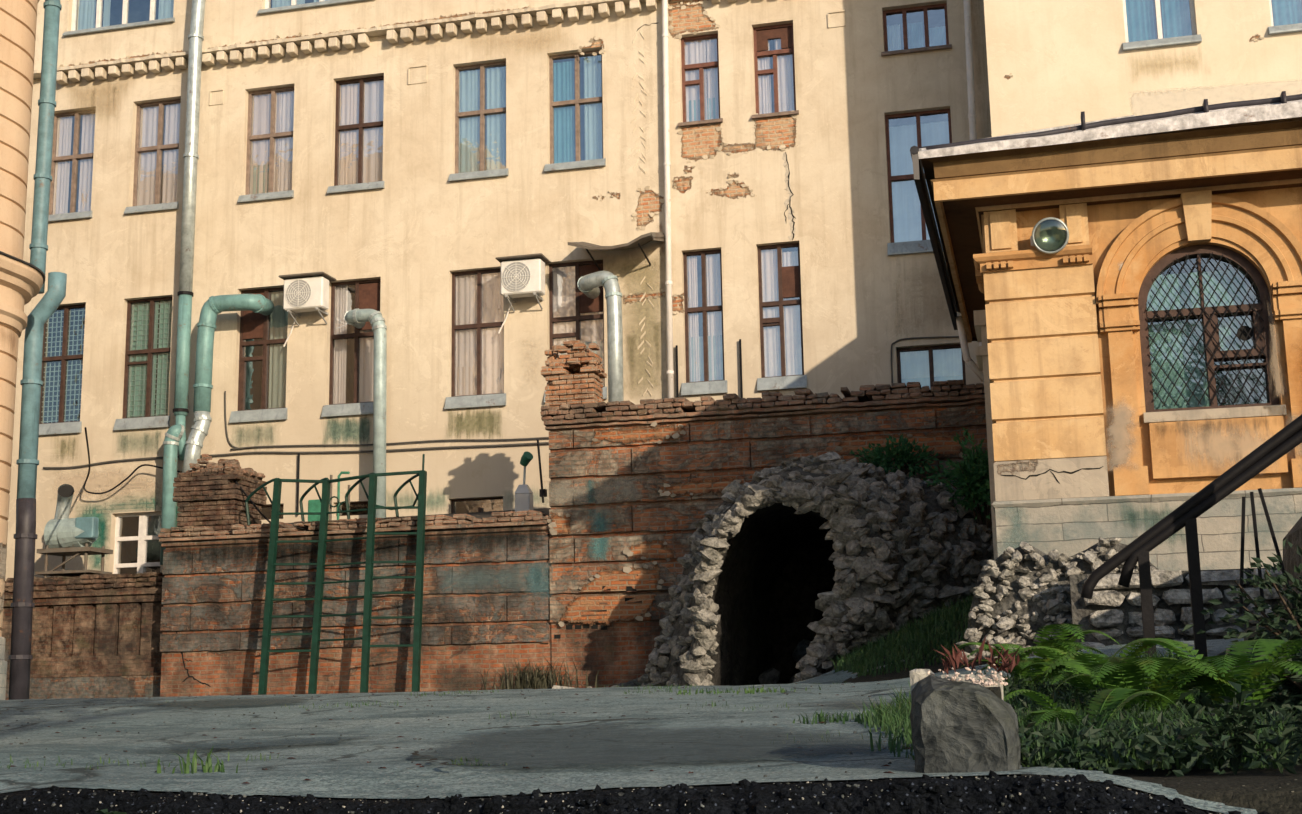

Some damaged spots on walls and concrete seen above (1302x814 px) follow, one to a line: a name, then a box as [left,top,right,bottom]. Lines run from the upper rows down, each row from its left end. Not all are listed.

flaking render [668,0,720,39]
flaking render [632,32,798,231]
crack [782,152,796,241]
crack [1002,466,1103,484]
flaking render [530,538,675,643]